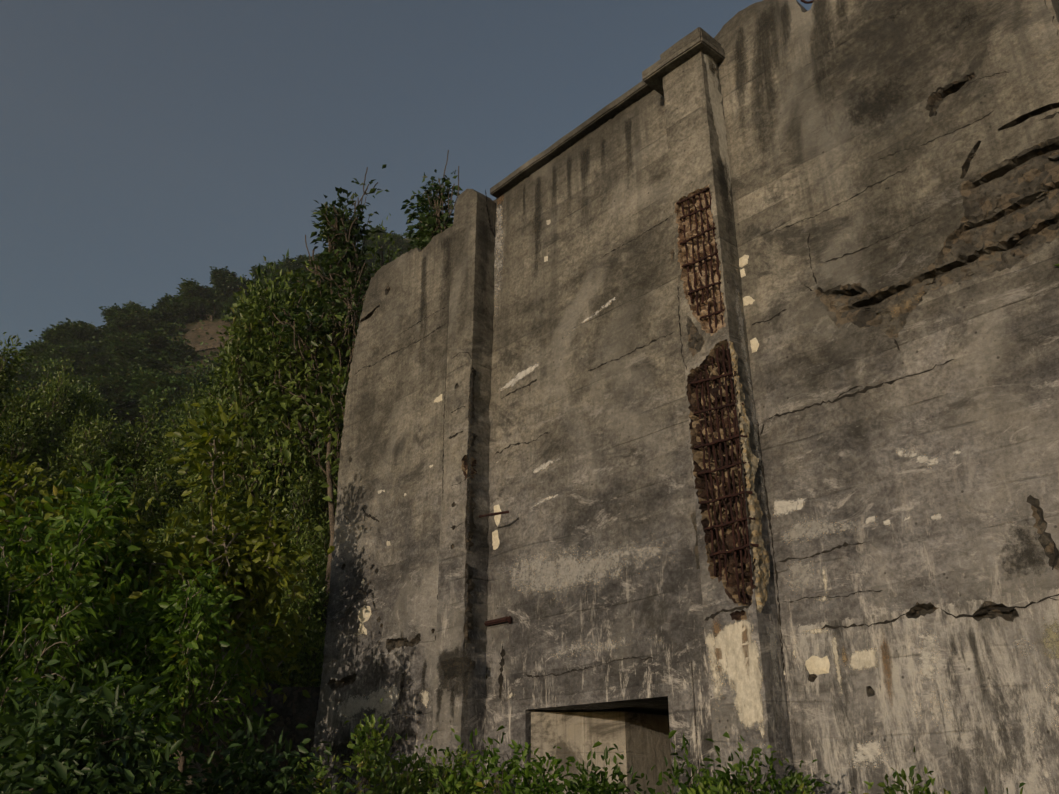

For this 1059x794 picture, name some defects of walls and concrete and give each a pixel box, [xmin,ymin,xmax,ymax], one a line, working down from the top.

leakage [813,0,845,76]
leakage [523,150,588,270]
crack [777,102,1059,231]
spalling [805,136,1059,351]
spalling [670,185,770,613]
crack [757,359,953,684]
spalling [377,616,436,654]
crack [705,605,750,621]
crack [940,594,1059,618]